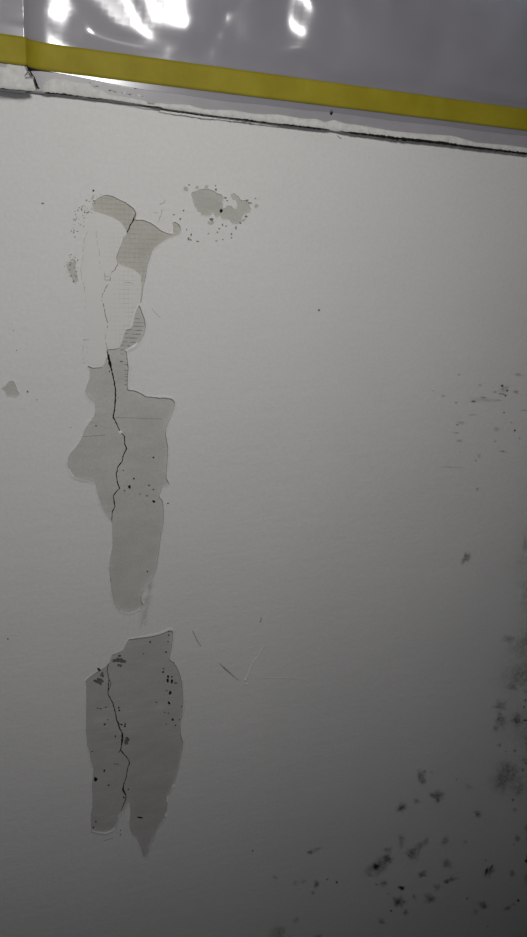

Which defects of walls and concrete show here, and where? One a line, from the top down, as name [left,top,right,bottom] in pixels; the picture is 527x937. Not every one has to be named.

crack [0,65,527,155]
crack [81,214,147,520]
peeling [64,185,259,616]
crack [107,663,130,810]
peeling [83,627,186,860]